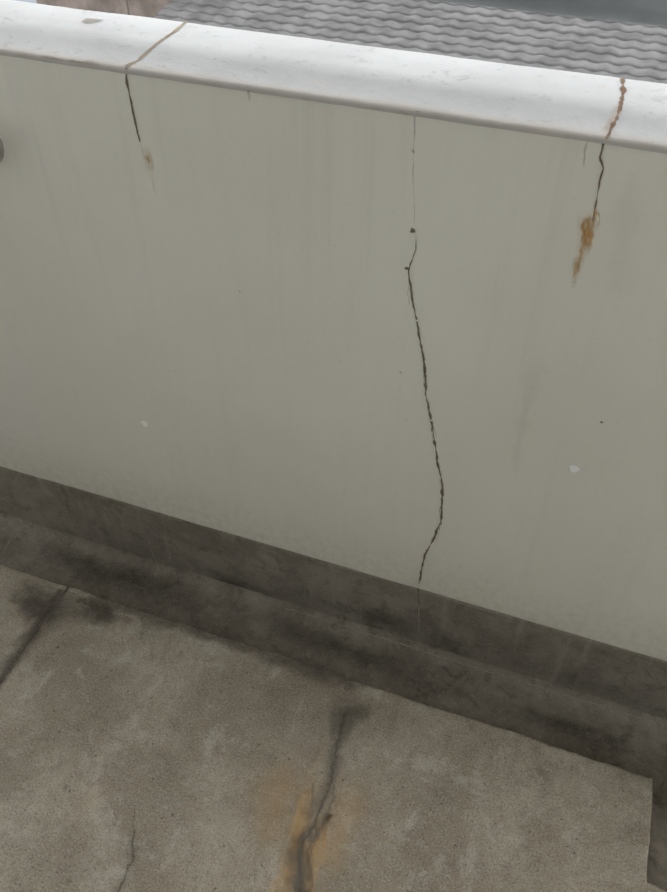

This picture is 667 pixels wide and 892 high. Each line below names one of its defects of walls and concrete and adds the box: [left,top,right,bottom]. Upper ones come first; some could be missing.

crack [125,22,187,145]
crack [589,78,627,227]
corrosion [575,211,600,272]
crack [260,234,667,726]